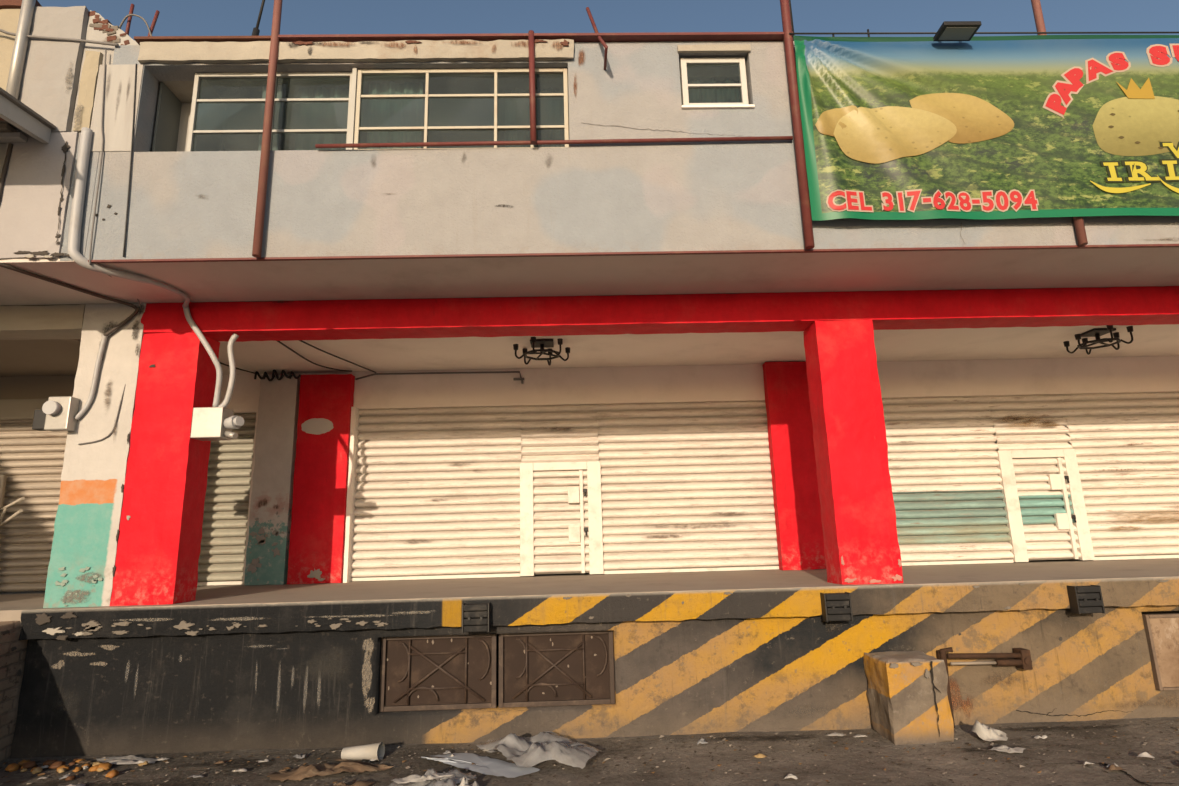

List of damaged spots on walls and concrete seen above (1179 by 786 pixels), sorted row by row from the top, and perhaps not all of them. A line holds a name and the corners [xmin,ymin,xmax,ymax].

flaking render [88,4,135,45]
spalling [0,566,267,669]
flaking render [308,611,430,712]
crack [930,661,941,737]
rust [936,647,1033,728]
crack [1016,709,1133,717]